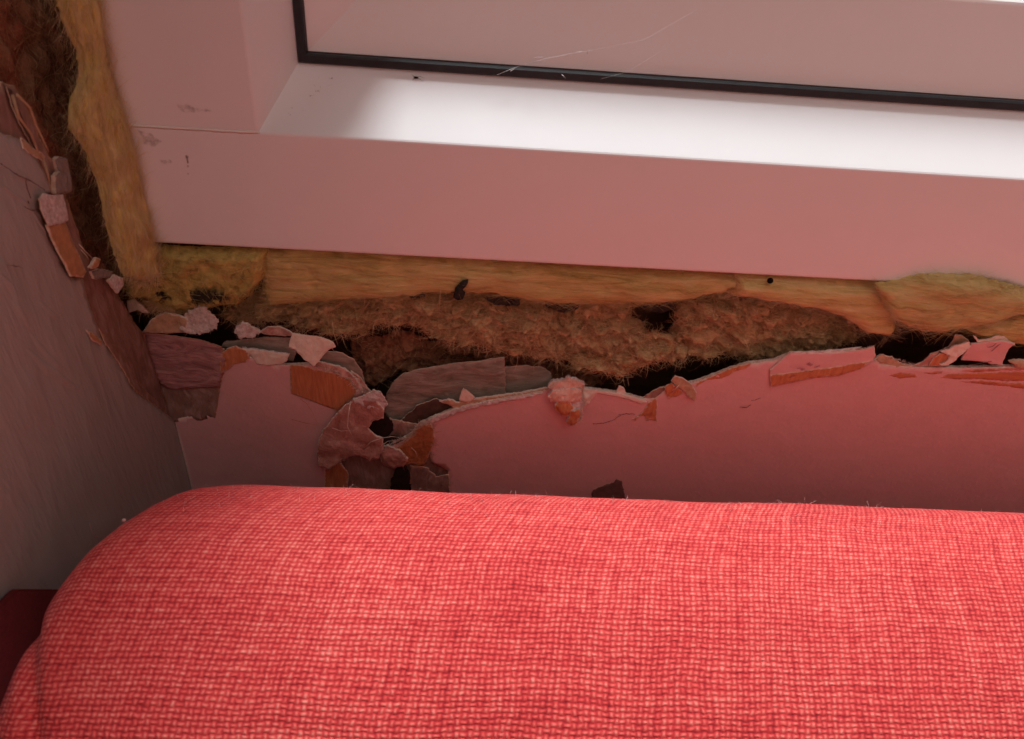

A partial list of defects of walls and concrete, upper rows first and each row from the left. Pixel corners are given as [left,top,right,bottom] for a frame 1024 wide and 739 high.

peeling [288,332,336,366]
peeling [769,345,876,387]
peeling [914,334,1015,367]
peeling [459,388,475,403]
spalling [632,386,665,421]
spalling [591,479,626,499]